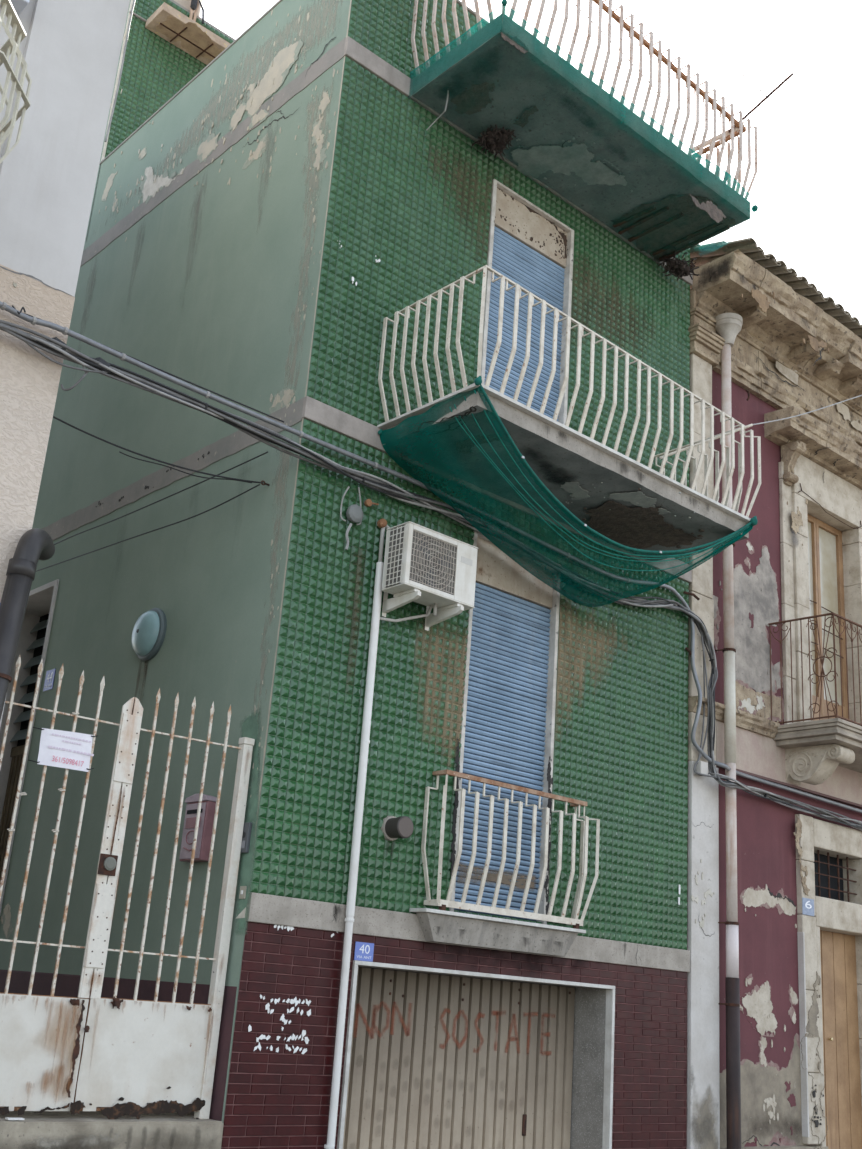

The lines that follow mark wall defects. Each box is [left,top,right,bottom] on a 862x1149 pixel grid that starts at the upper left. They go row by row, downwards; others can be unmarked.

peeling [99,5,309,222]
peeling [295,86,340,223]
peeling [509,95,633,192]
spalling [612,193,736,262]
peeling [712,540,784,722]
spalling [793,815,810,895]
peeling [740,884,797,928]
peeling [719,1069,727,1147]
peeling [740,971,828,1149]